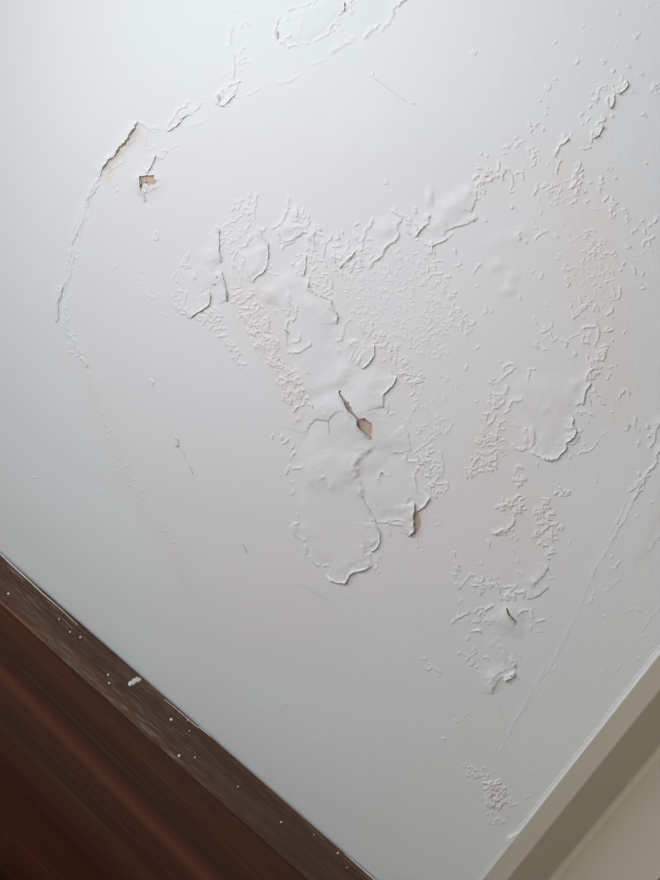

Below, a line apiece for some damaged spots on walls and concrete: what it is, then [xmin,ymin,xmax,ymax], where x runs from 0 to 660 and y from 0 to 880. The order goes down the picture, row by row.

flaking render [137,154,156,202]
peeling [470,59,660,201]
peeling [136,189,450,584]
peeling [463,388,508,480]
peeling [449,463,571,669]
spalling [460,762,530,844]